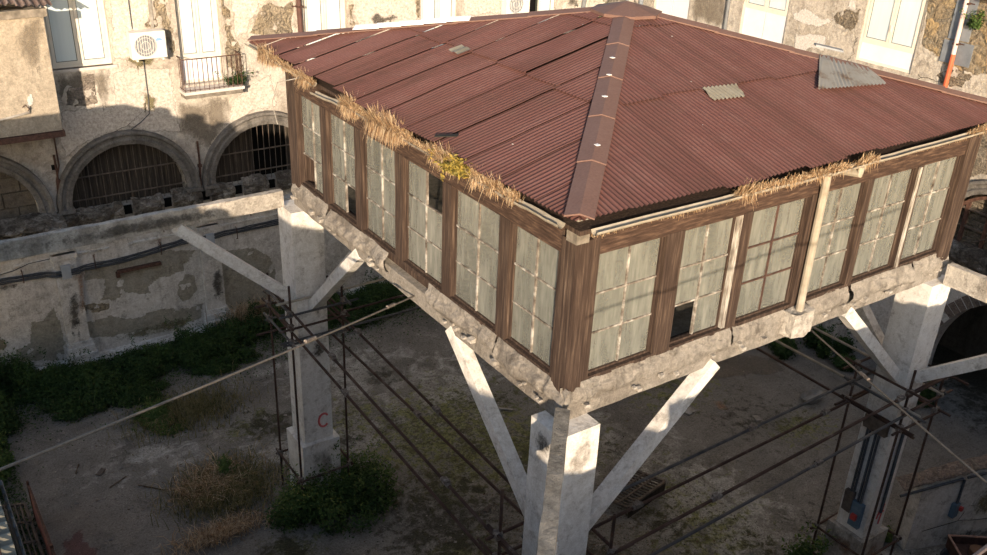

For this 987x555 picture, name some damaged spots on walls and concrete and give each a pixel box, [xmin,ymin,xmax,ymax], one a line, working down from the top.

peeling [348,0,420,28]
peeling [463,0,502,16]
peeling [60,0,181,157]
peeling [221,0,297,125]
peeling [970,133,987,181]
peeling [81,247,206,340]